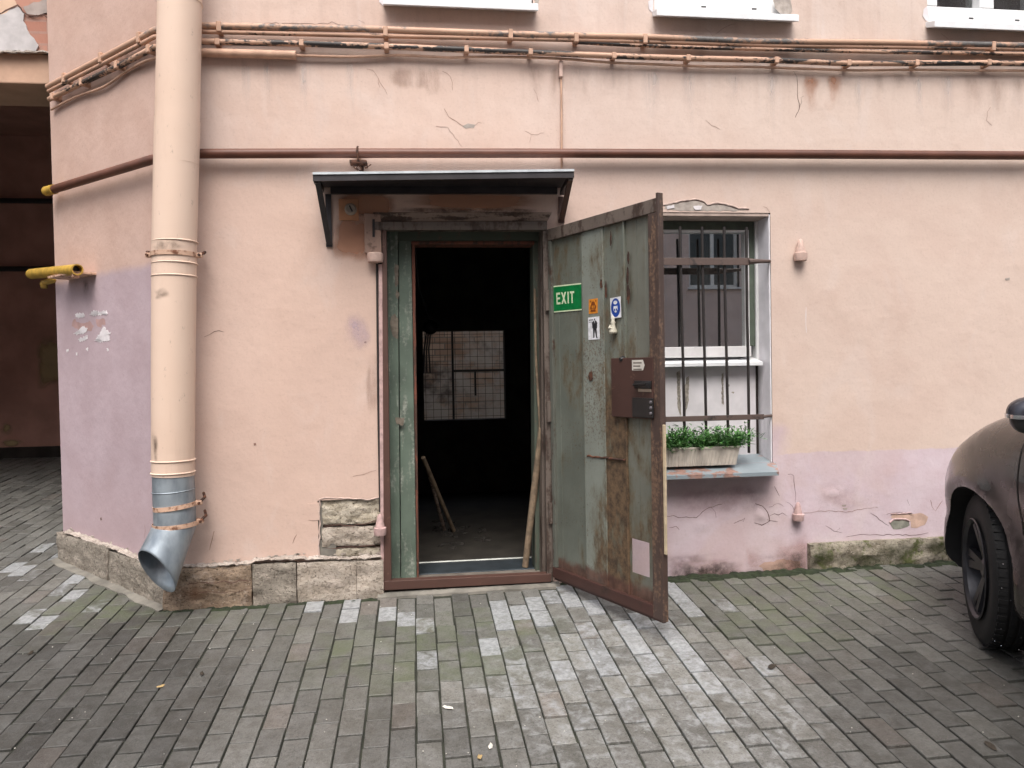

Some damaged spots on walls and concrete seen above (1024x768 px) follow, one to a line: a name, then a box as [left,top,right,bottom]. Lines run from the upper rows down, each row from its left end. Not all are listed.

flaking render [0,0,48,54]
flaking render [663,198,749,211]
peeling [39,310,111,383]
crack [770,474,925,537]
flaking render [890,512,928,529]